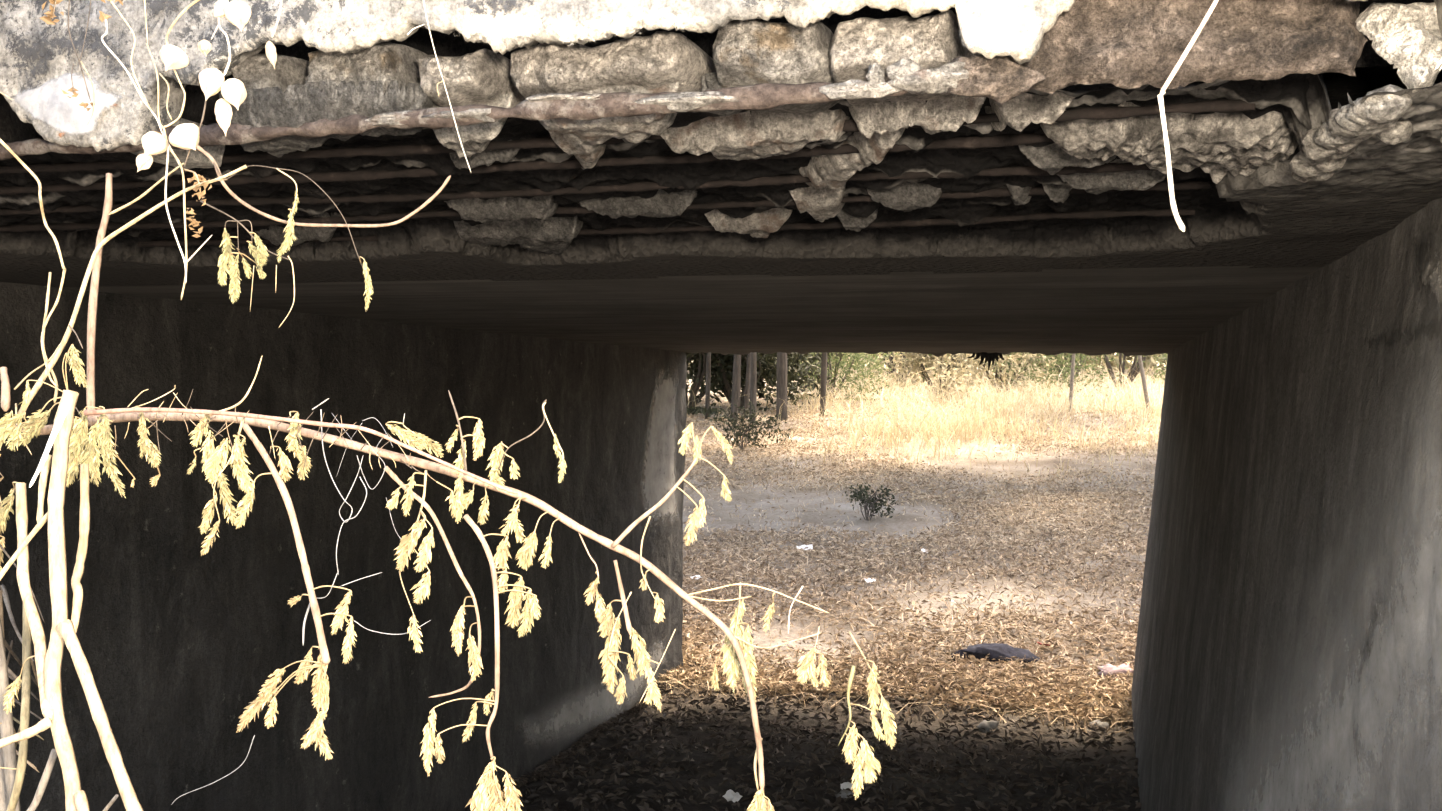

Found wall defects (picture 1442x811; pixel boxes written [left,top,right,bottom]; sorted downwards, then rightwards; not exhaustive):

spalling [0,0,1442,254]